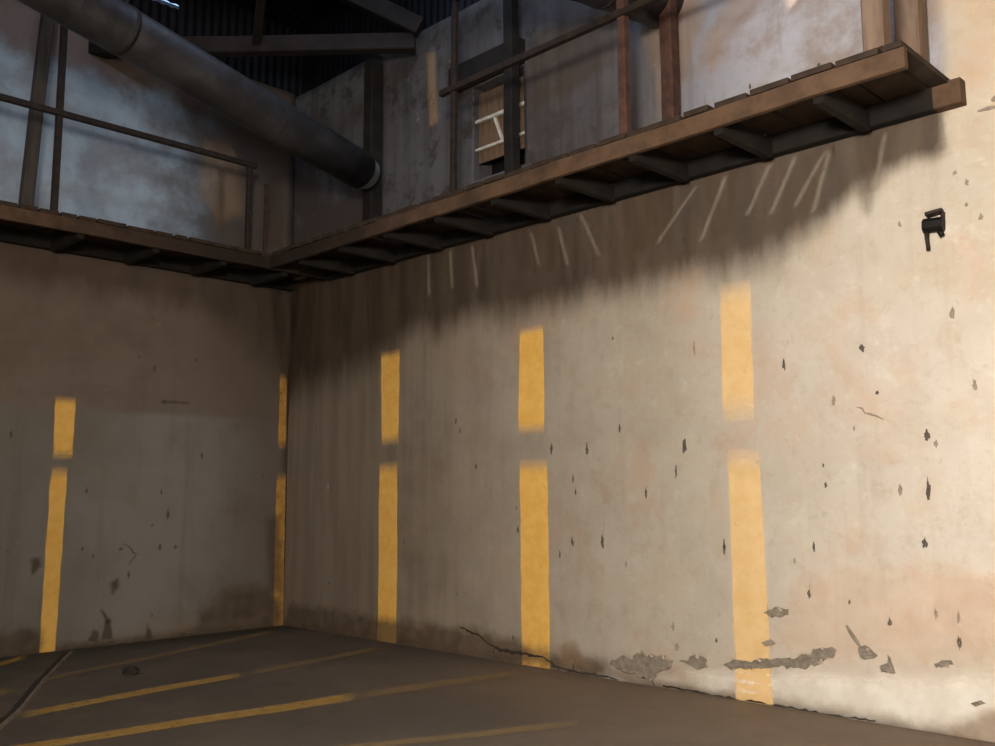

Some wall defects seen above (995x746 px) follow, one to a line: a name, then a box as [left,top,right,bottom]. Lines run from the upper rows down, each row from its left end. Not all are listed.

spalling [763,607,789,618]
crack [459,627,618,680]
spalling [609,643,708,682]
spalling [724,639,836,670]
crack [846,625,861,647]
crack [642,676,875,722]